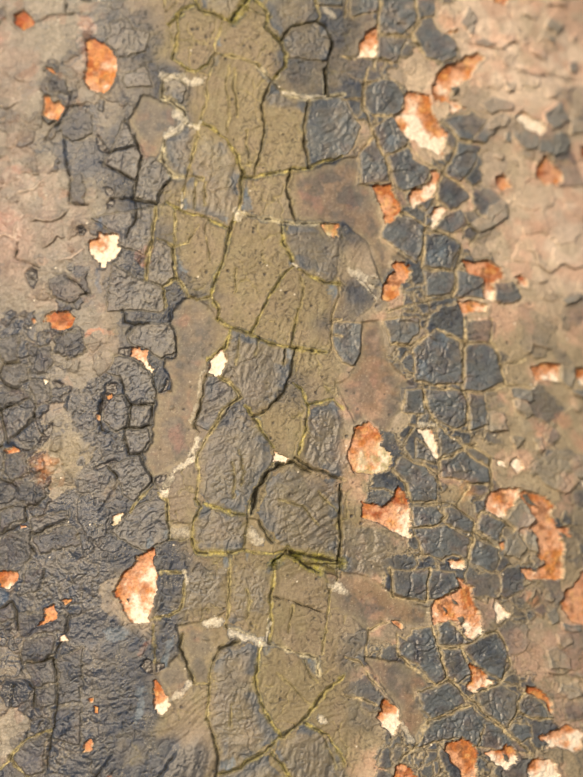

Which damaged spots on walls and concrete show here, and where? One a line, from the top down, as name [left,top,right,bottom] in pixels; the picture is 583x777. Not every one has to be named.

crack [45,91,89,206]
rust [393,52,486,157]
peeling [434,0,583,307]
crack [99,0,555,777]
rust [347,421,394,475]
peeling [417,427,439,459]
peeling [483,365,583,566]
crack [0,602,30,635]
crack [0,620,70,777]
rust [111,547,159,624]
peeling [507,586,583,714]
rust [444,737,518,777]